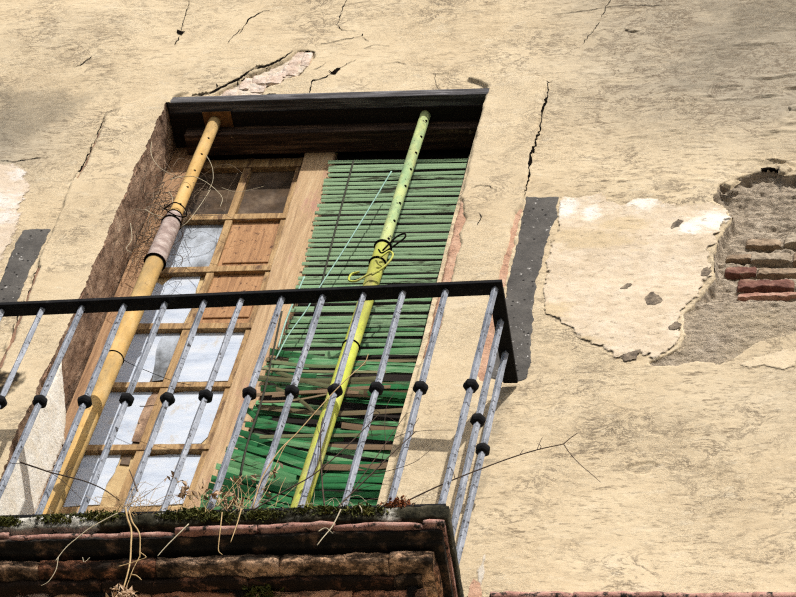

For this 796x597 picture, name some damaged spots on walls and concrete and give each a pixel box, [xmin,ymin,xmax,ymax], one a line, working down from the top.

flaking render [220,52,313,96]
crack [192,1,379,96]
crack [560,0,670,41]
crack [79,109,117,172]
crack [525,82,549,194]
peeling [543,164,796,369]